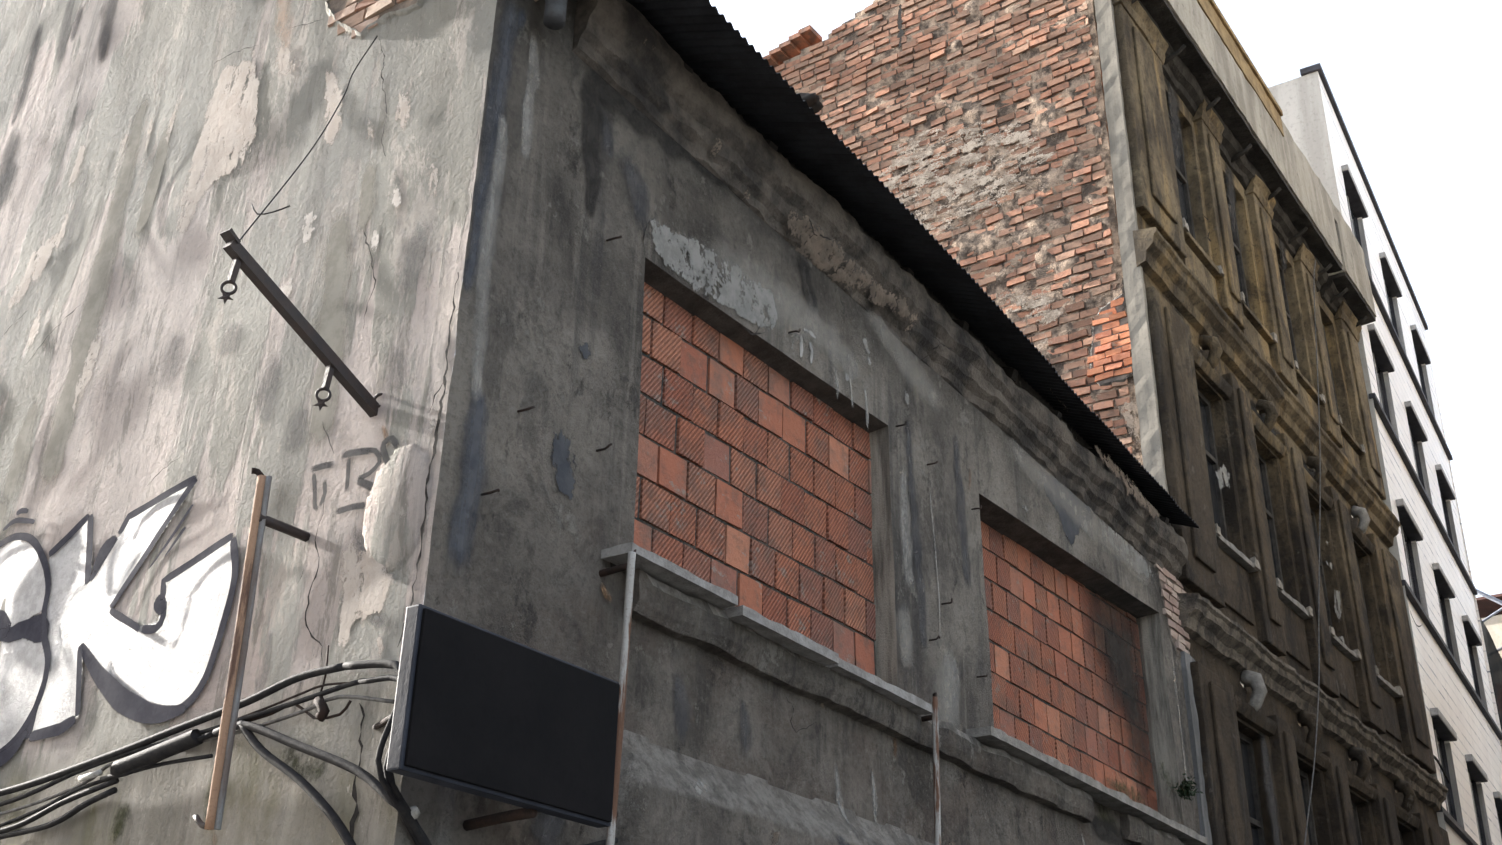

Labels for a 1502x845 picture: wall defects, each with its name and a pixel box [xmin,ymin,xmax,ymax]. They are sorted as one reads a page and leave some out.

damp [57,0,83,62]
damp [98,0,117,60]
spalling [325,0,424,40]
damp [0,25,42,203]
peeling [176,49,260,233]
peeling [323,72,343,145]
damp [582,81,646,224]
crack [363,229,376,329]
crack [398,272,459,646]
crack [300,498,325,659]
peeling [336,542,394,659]
crack [349,703,365,837]